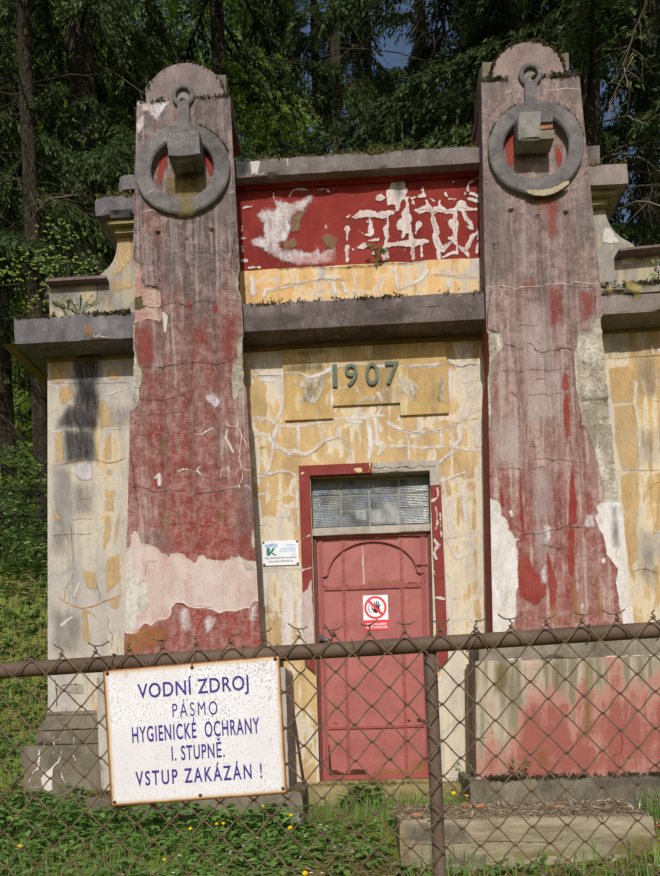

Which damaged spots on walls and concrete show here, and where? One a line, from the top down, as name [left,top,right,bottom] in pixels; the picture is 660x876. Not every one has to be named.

peeling [233,226,357,307]
peeling [344,177,481,290]
crack [276,248,597,398]
crack [421,207,475,251]
water stain [61,354,101,461]
crack [51,361,351,541]
flaking render [562,292,642,624]
peeling [104,490,119,548]
flaking render [84,530,314,645]
flaking render [490,487,557,632]